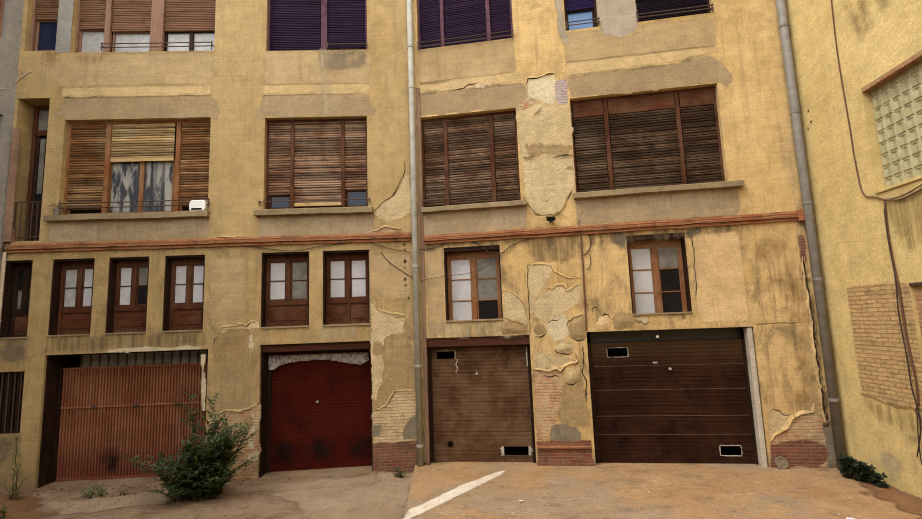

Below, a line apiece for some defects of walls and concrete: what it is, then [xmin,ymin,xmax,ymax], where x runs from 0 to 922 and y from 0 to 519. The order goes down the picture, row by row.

peeling [596,0,639,39]
peeling [516,72,575,218]
peeling [369,173,411,263]
flaking render [370,301,417,473]
peeling [503,261,583,342]
flaking render [532,352,595,466]
crack [763,256,829,429]
flaking render [768,403,837,468]